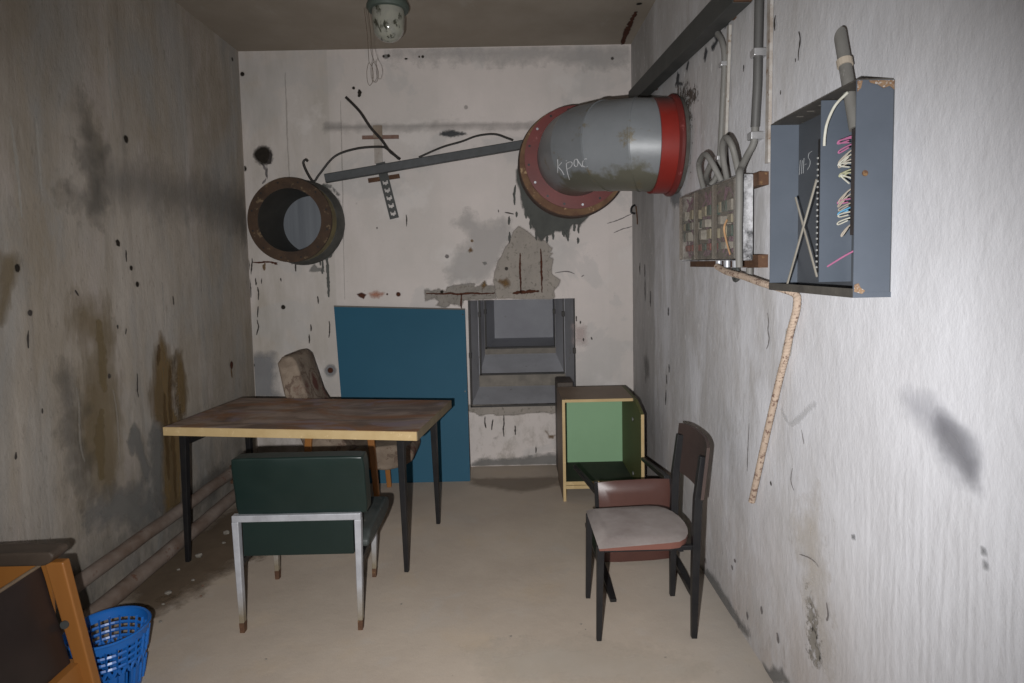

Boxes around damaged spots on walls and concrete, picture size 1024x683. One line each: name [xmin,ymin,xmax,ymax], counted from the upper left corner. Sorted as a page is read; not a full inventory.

flaking render [425,226,560,308]
damp [81,312,114,492]
flaking render [806,583,822,669]